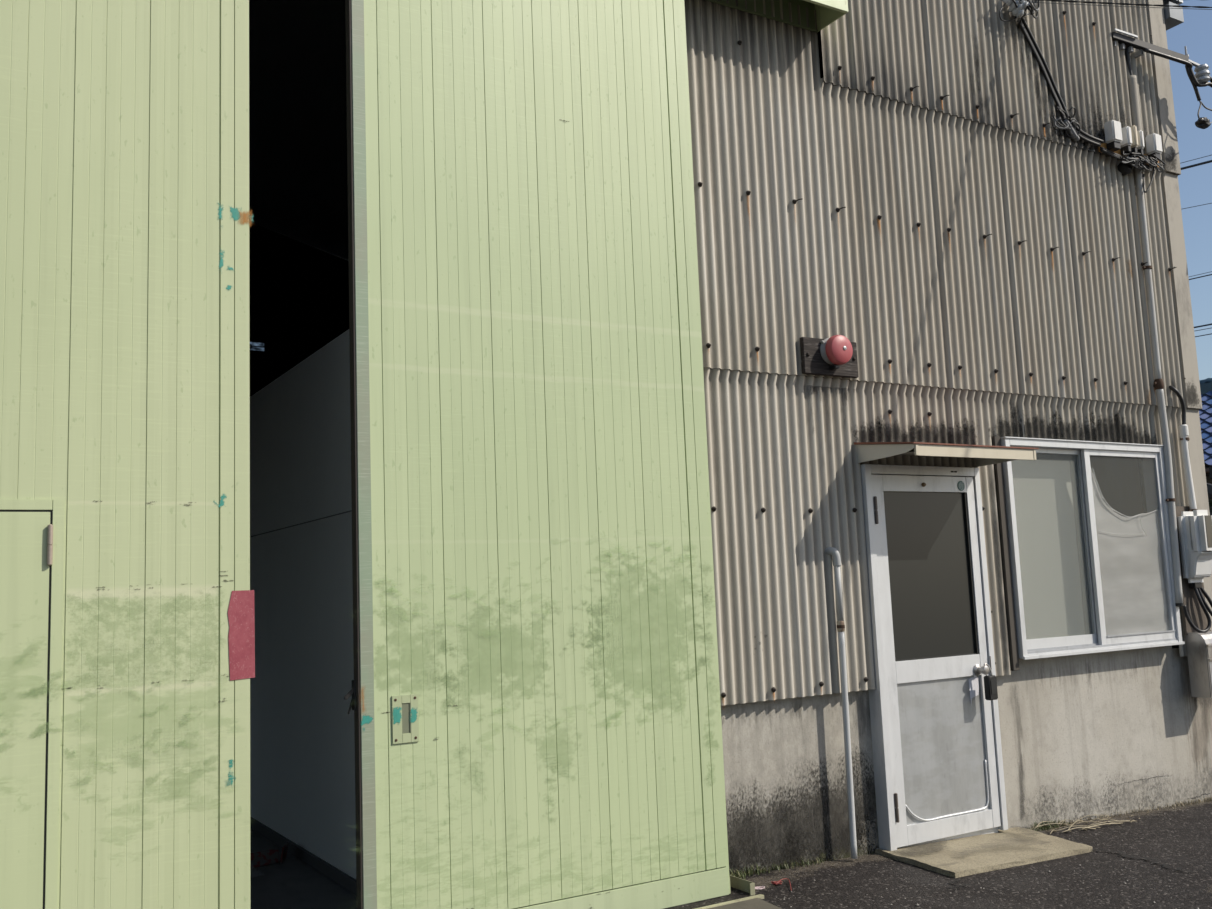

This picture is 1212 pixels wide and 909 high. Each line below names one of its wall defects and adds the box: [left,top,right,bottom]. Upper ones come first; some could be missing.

damp [854,407,1157,445]
damp [726,753,879,875]